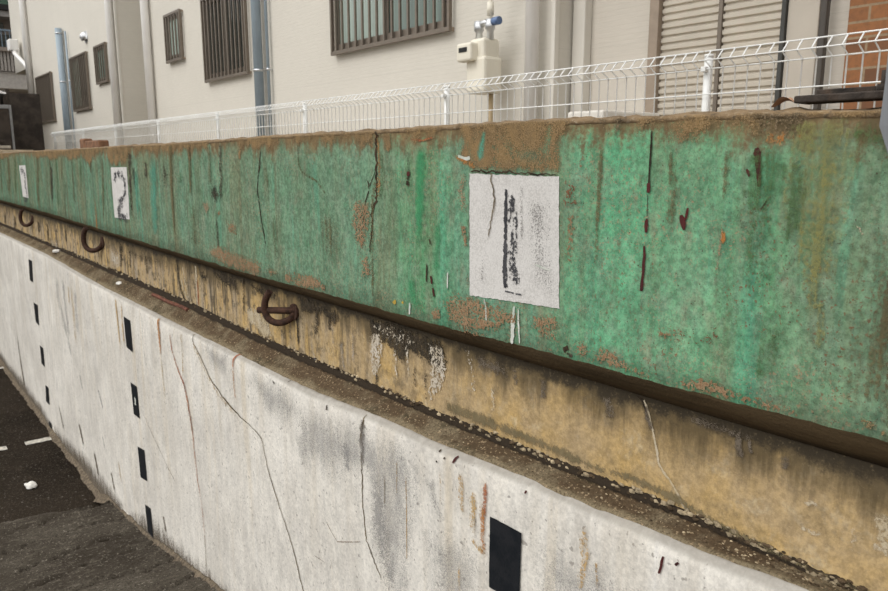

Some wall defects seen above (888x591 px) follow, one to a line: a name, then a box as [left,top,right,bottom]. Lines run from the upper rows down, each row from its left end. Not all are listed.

crack [363,131,383,295]
peeling [446,120,577,261]
corrosion [157,319,200,493]
crack [192,333,303,590]
crack [327,416,381,577]
damp [300,424,410,576]
damp [369,318,448,401]
corrosion [458,476,487,554]
peeling [431,291,559,341]
damp [446,389,828,578]
crack [637,396,689,512]
peeling [680,378,797,416]